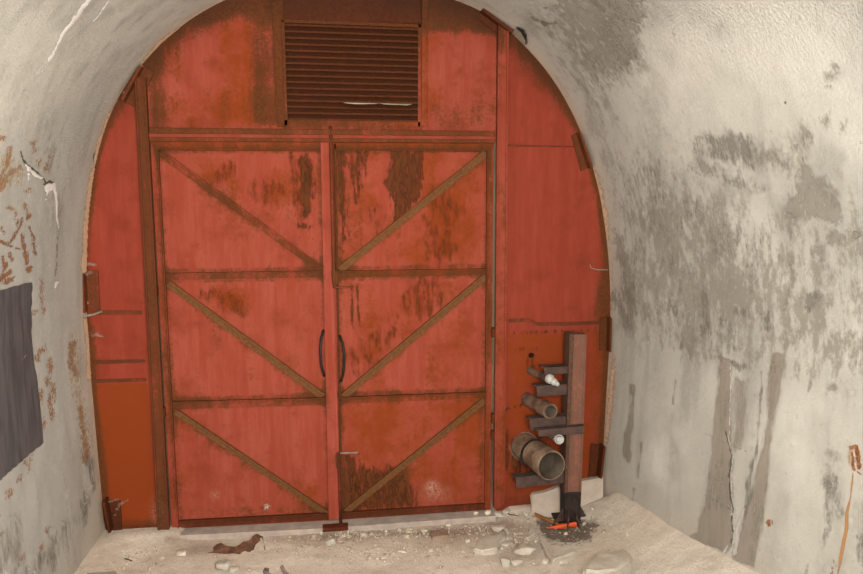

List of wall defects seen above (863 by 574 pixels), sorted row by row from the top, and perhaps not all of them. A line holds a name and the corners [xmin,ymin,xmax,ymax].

corrosion [0,135,46,315]
crack [20,151,59,271]
corrosion [253,152,316,228]
corrosion [384,151,424,222]
water stain [699,131,787,173]
water stain [786,165,843,255]
corrosion [344,454,418,510]
water stain [623,385,642,461]
water stain [690,353,784,567]
corrosion [830,476,853,574]